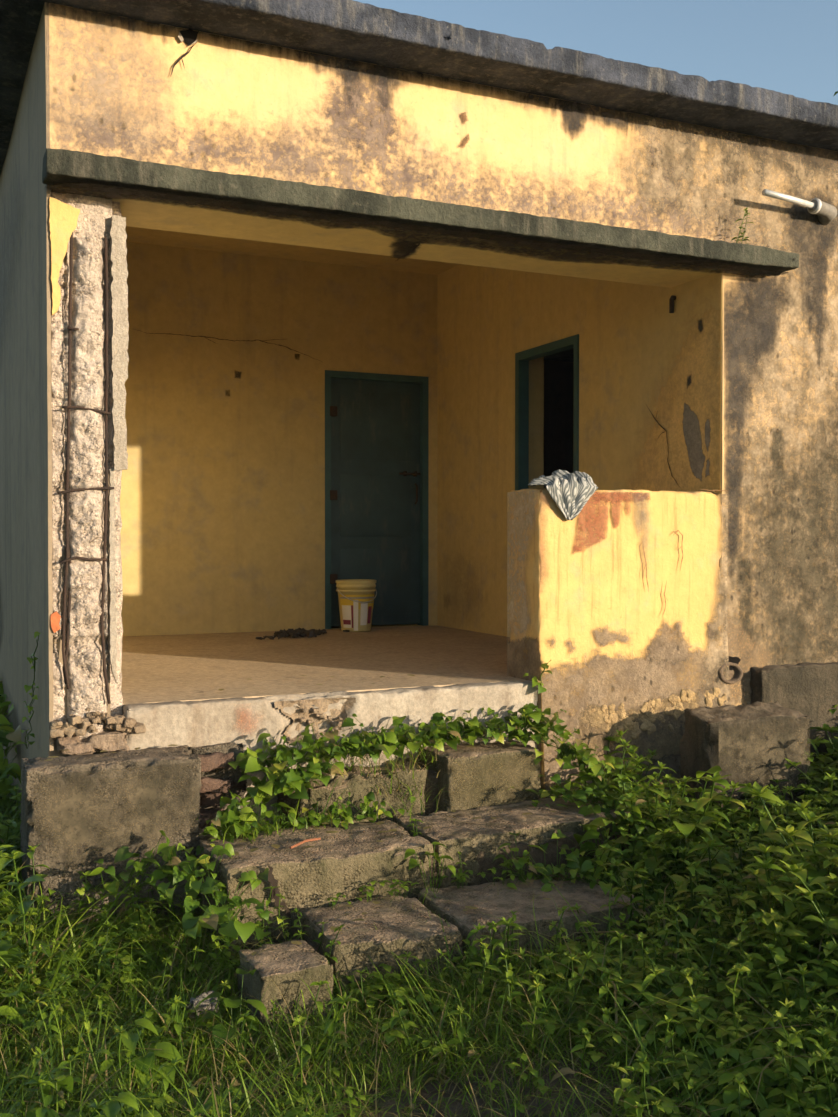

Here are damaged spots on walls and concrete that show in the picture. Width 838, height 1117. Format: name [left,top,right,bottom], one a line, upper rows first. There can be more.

crack [170,42,197,77]
crack [134,329,322,362]
damp [46,3,838,709]
spalling [49,192,146,755]
crack [648,408,726,493]
peeling [682,403,711,481]
spalling [274,697,356,743]
spalling [541,617,727,798]